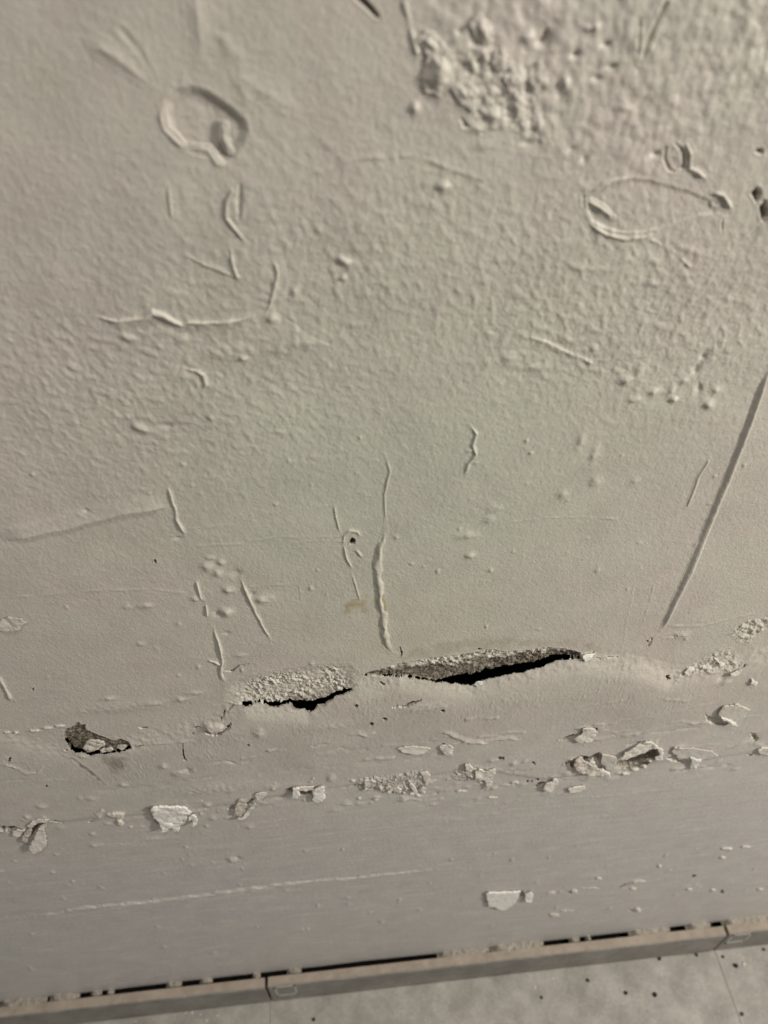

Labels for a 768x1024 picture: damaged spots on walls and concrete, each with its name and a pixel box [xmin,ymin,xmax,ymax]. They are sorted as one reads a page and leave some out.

spalling [668,612,768,686]
spalling [220,645,619,712]
spalling [2,721,147,756]
peeling [703,703,768,757]
peeling [349,768,431,801]
peeling [509,741,718,793]
peeling [0,818,67,854]
peeling [86,805,198,833]
peeling [480,890,533,911]